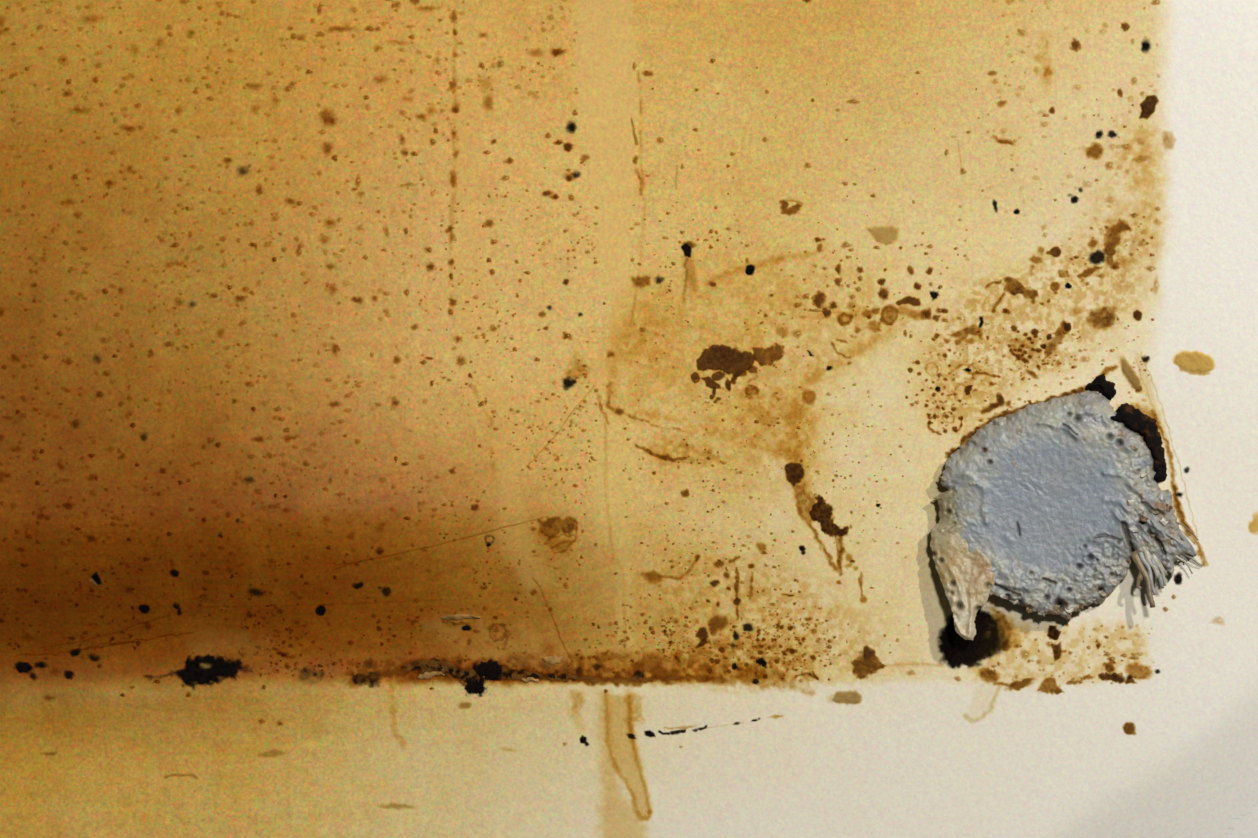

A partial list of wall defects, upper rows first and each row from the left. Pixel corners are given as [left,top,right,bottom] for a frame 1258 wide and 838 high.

damp [1089,250,1105,264]
rust [785,463,804,486]
rust [810,495,854,562]
peeling [1128,493,1173,537]
peeling [930,490,1130,641]
damp [997,617,1009,634]
damp [177,654,242,689]
damp [412,658,545,696]